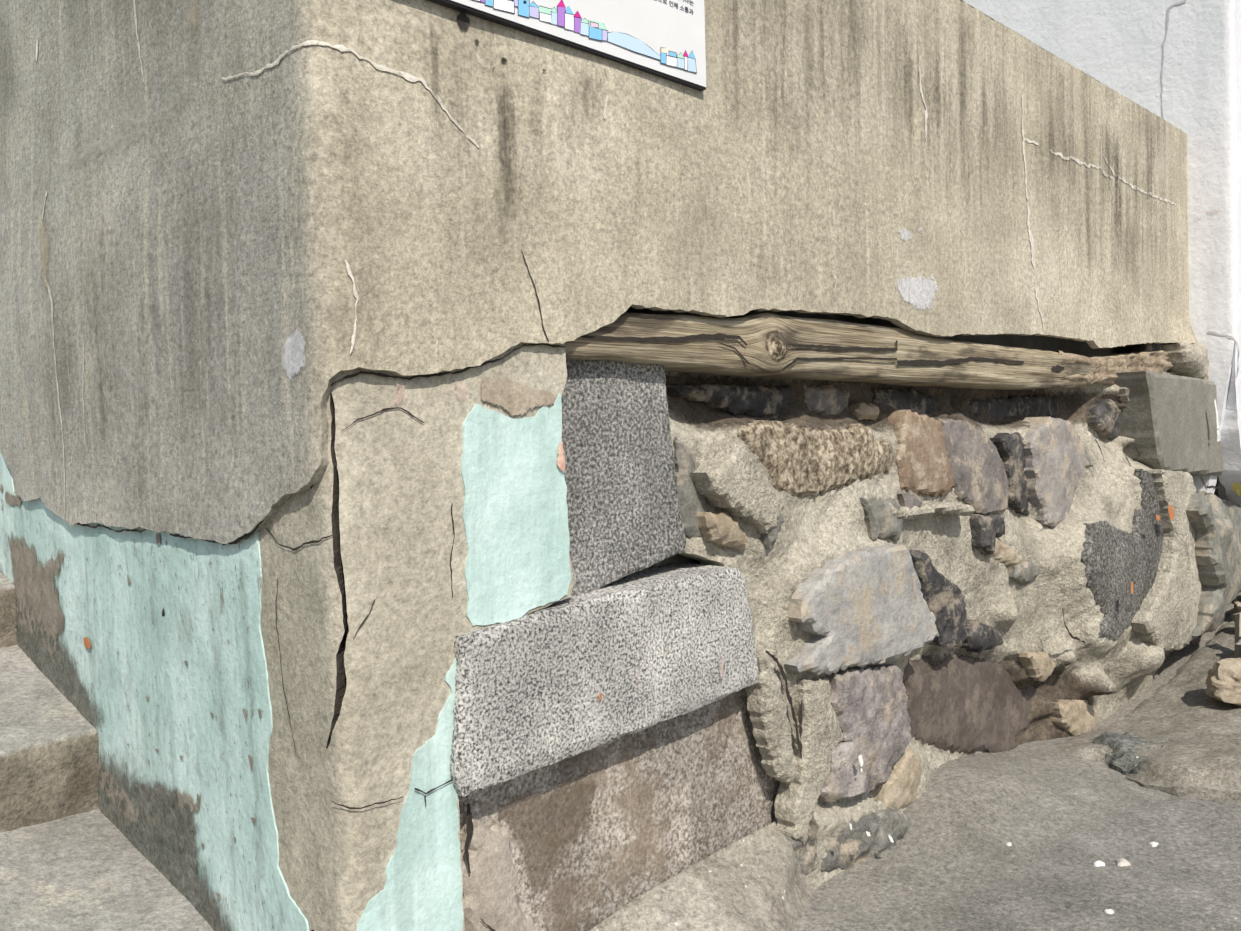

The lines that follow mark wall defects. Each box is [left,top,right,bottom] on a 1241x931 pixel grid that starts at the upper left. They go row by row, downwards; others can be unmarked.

crack [221,40,479,148]
crack [1160,0,1186,119]
crack [1022,96,1176,330]
crack [1208,331,1239,380]
peeling [0,485,21,507]
crack [43,252,565,757]
peeling [8,535,65,664]
peeling [97,761,144,826]
peeling [167,789,201,816]